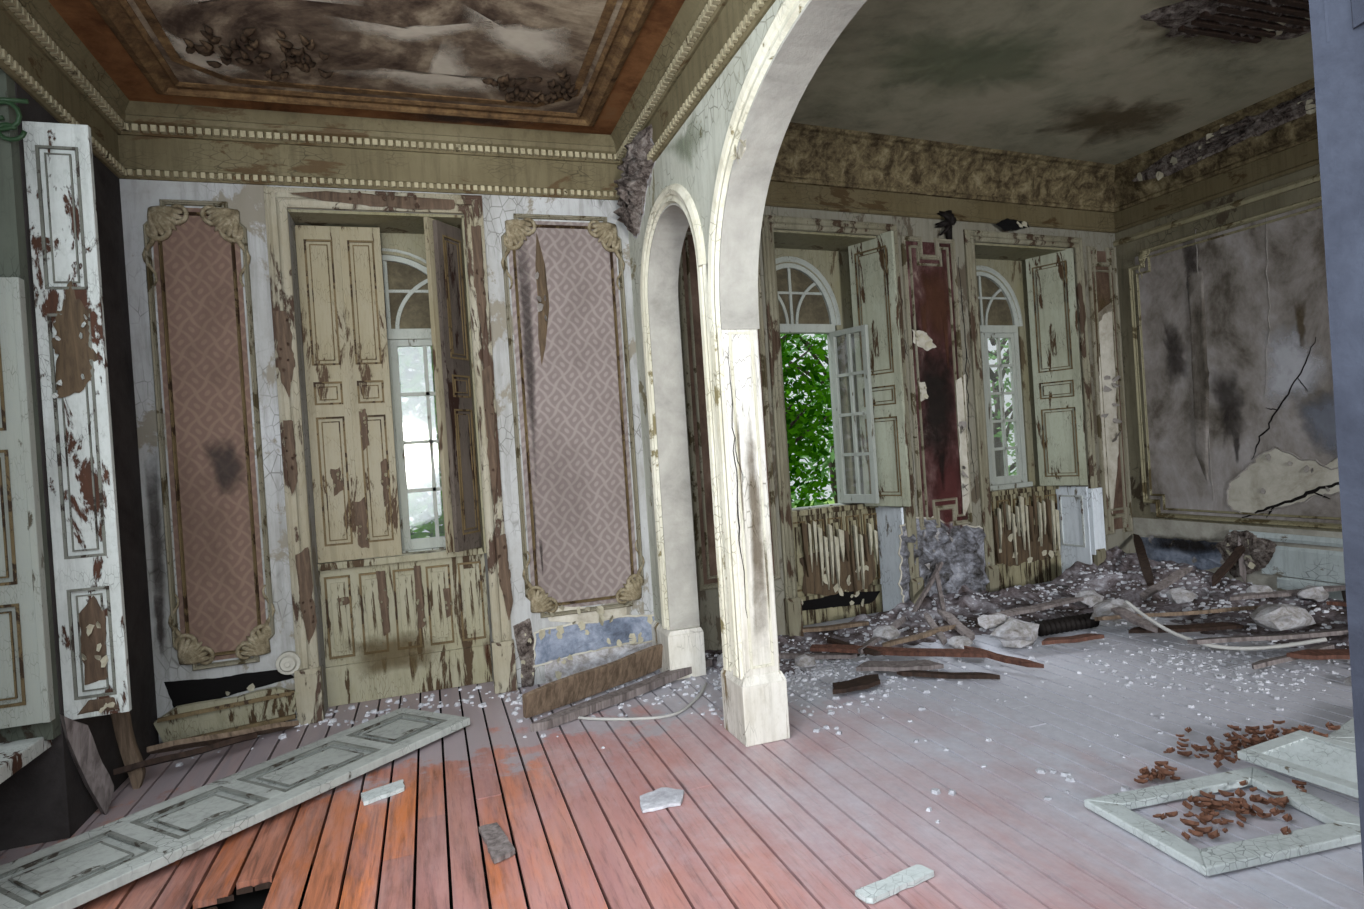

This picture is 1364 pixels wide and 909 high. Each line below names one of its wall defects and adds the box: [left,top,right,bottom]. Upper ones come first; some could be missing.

damp [1067,105,1167,138]
peeling [51,281,98,399]
peeling [273,311,295,398]
crack [1251,218,1316,460]
damp [210,449,239,488]
peeling [359,409,369,451]
damp [920,277,962,534]
peeling [1140,446,1340,578]
peeling [376,571,390,636]
spalling [496,534,655,688]
peeling [799,521,880,611]
spalling [164,670,294,708]